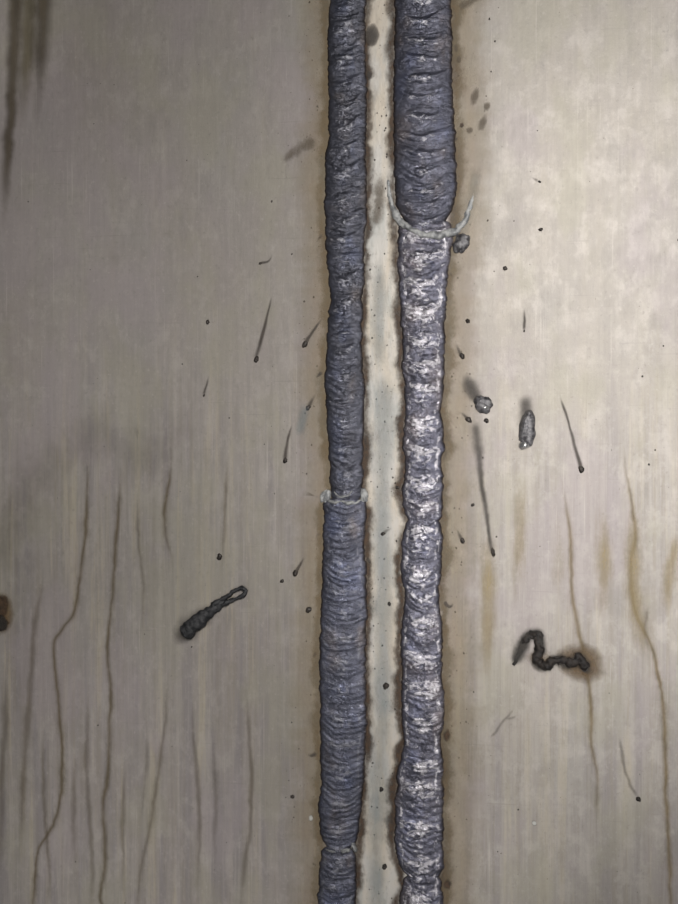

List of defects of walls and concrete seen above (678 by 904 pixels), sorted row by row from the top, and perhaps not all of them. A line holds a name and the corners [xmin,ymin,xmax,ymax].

leakage [5,0,48,168]